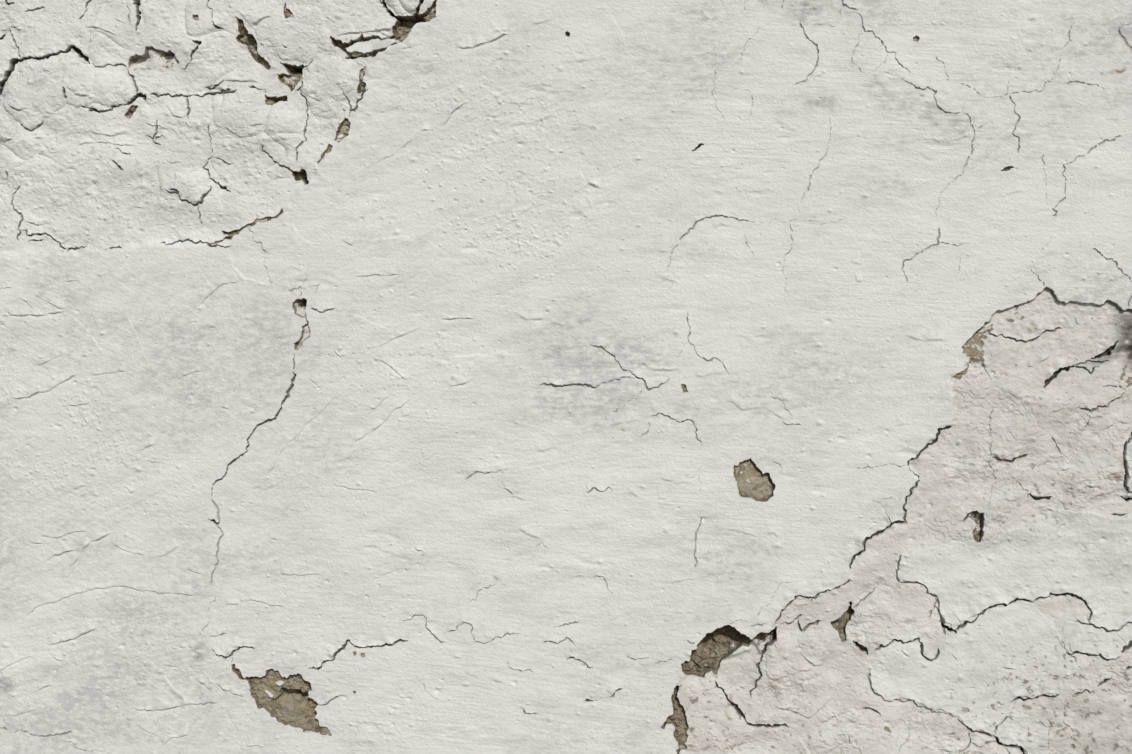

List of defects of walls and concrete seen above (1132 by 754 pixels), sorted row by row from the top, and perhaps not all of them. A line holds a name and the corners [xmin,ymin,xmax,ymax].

peeling [0,0,437,255]
crack [538,115,849,570]
crack [710,0,1124,289]
crack [1089,247,1132,310]
crack [1117,22,1132,50]
crack [199,351,297,665]
peeling [661,286,1132,754]
spalling [231,663,332,737]